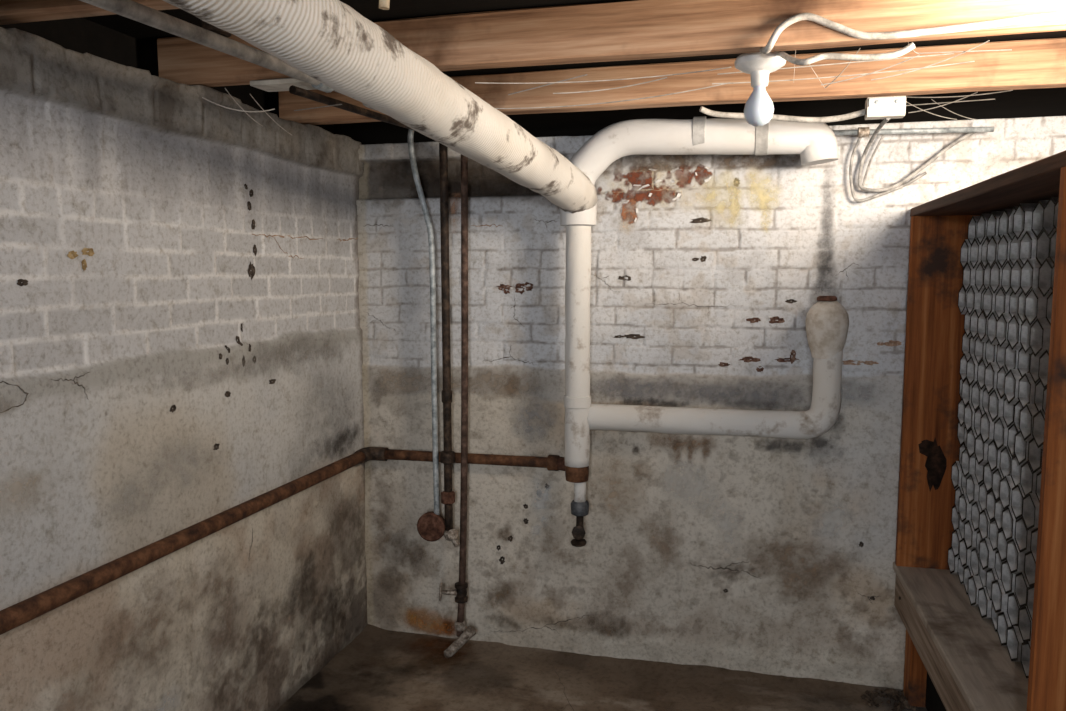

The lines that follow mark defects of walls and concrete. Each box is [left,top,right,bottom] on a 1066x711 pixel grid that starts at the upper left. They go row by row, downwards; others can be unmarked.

peeling [598,165,712,224]
crack [0,381,29,413]
leakage [609,380,792,408]
leakage [656,437,708,459]
rust [409,614,467,667]